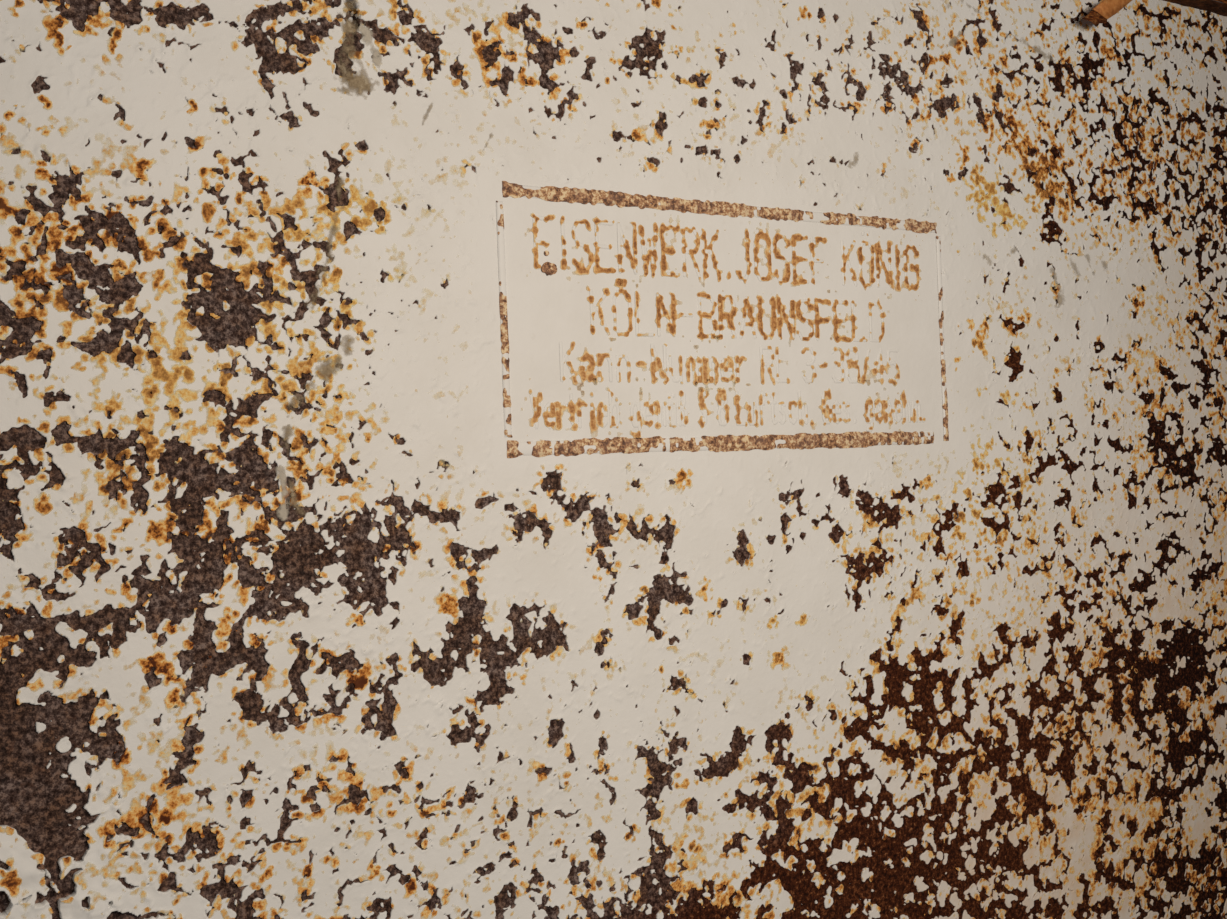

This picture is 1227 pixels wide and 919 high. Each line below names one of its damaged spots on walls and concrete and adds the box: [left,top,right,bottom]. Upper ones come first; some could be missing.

rust [169,0,207,28]
rust [1082,0,1132,27]
rust [0,36,67,63]
rust [0,76,68,154]
rust [941,95,1115,245]
rust [360,195,407,234]
rust [380,256,406,283]
rust [286,269,420,493]
peeling [0,104,571,919]